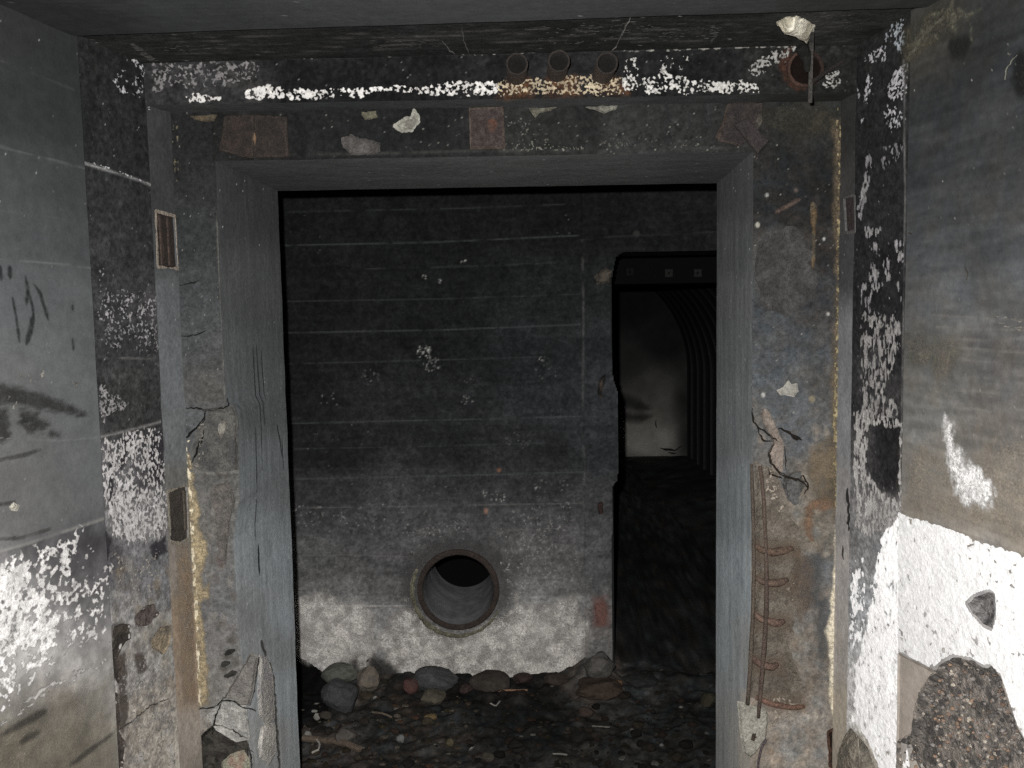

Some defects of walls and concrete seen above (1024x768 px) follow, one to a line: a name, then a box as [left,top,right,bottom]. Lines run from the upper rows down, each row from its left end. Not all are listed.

crack [186,398,229,464]
crack [751,408,809,494]
peeling [849,143,1024,768]
damp [907,416,1024,535]
spalling [750,408,808,727]
crack [199,640,280,768]